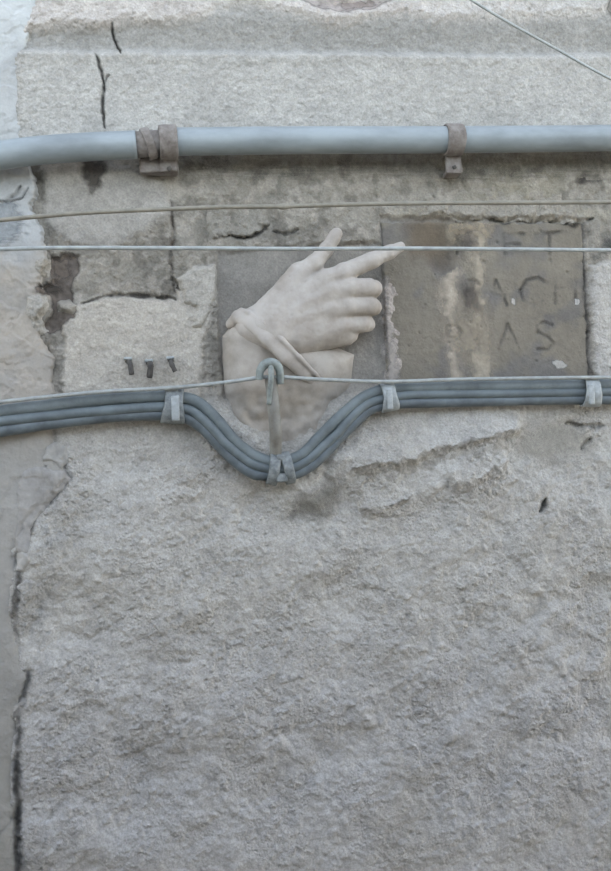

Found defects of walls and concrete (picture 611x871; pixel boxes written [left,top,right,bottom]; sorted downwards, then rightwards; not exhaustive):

spalling [304,0,391,12]
crack [97,58,105,127]
damp [447,222,491,377]
crack [12,571,21,629]